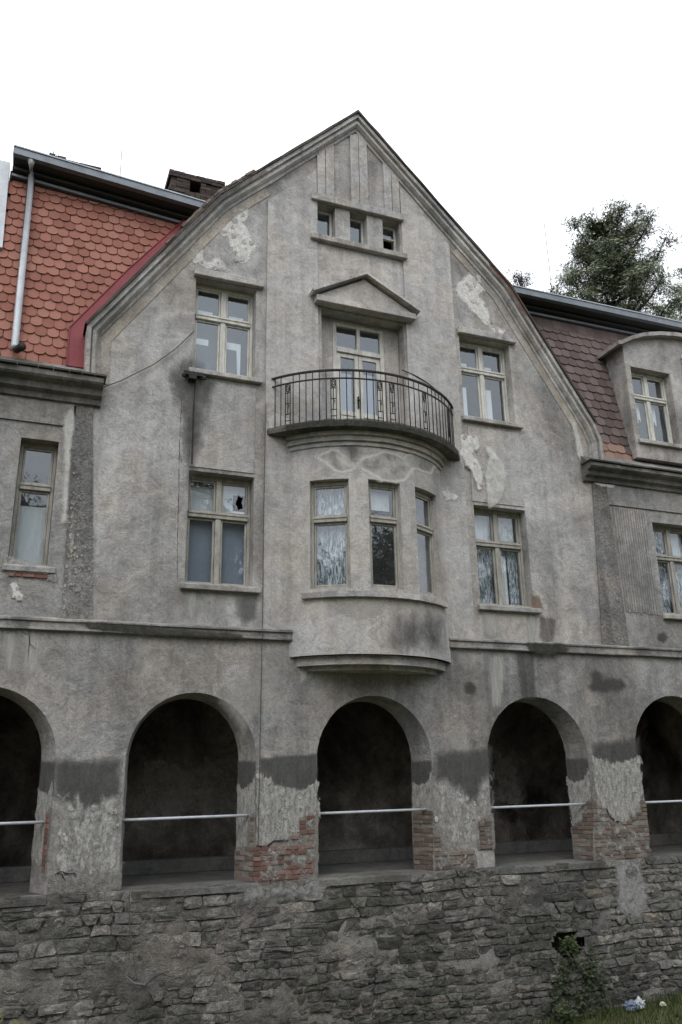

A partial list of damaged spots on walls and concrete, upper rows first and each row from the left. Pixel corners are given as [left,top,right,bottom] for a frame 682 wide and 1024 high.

peeling [190,209,256,272]
peeling [455,272,506,334]
peeling [459,433,483,490]
peeling [0,472,94,610]
peeling [31,781,122,895]
water stain [39,761,118,814]
peeling [139,749,321,883]
water stain [237,755,317,790]
water stain [411,749,490,804]
peeling [411,749,523,871]
water stain [566,741,638,783]
flaking render [566,755,652,861]